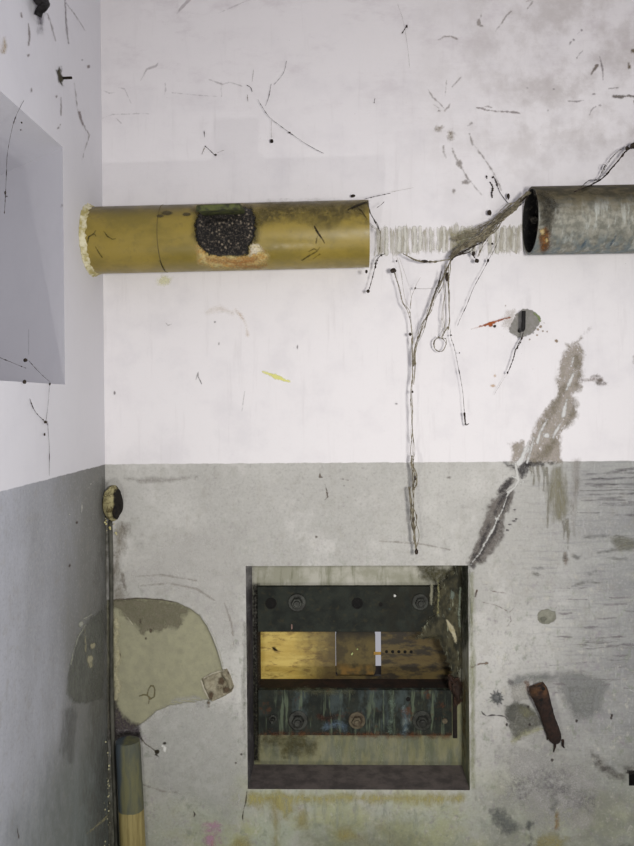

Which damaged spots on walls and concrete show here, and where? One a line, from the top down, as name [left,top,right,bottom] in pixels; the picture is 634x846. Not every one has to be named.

leakage [512,338,602,535]
spalling [68,599,229,834]
leakage [249,792,444,821]